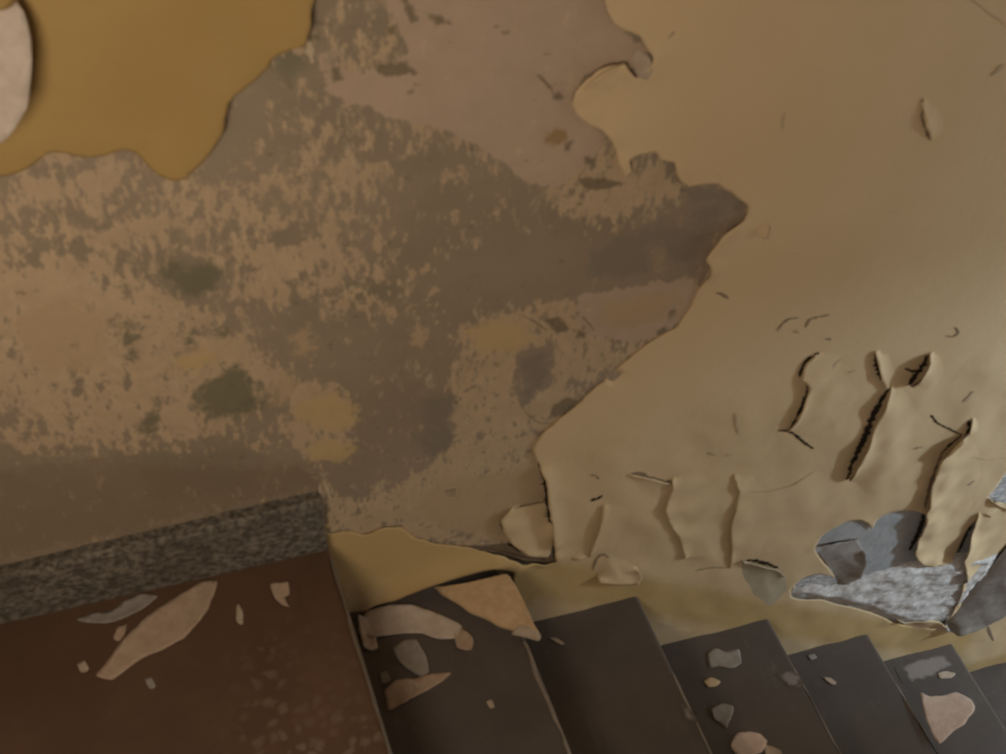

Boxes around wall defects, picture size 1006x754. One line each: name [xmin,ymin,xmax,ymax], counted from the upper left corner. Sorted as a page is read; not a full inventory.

peeling [0,0,748,645]
water stain [0,451,342,565]
spalling [665,418,1006,636]
peeling [77,580,217,680]
peeling [358,615,378,651]